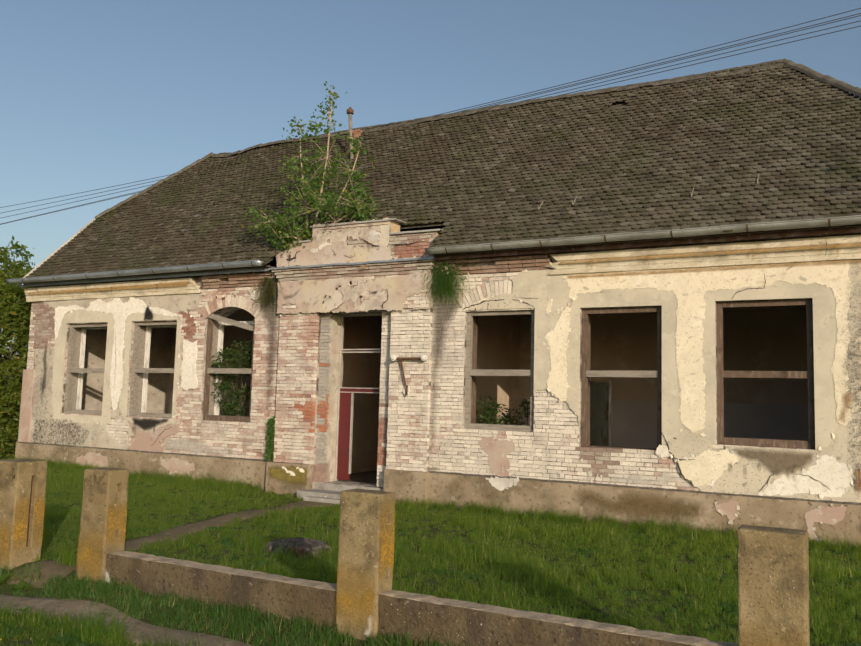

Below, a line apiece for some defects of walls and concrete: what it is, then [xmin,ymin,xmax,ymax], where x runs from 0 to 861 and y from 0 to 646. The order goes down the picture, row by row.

peeling [307,226,433,259]
peeling [320,278,389,311]
damp [560,243,861,408]
peeling [29,297,199,475]
spalling [290,394,329,432]
peeling [512,262,856,543]
flaking render [477,436,519,489]